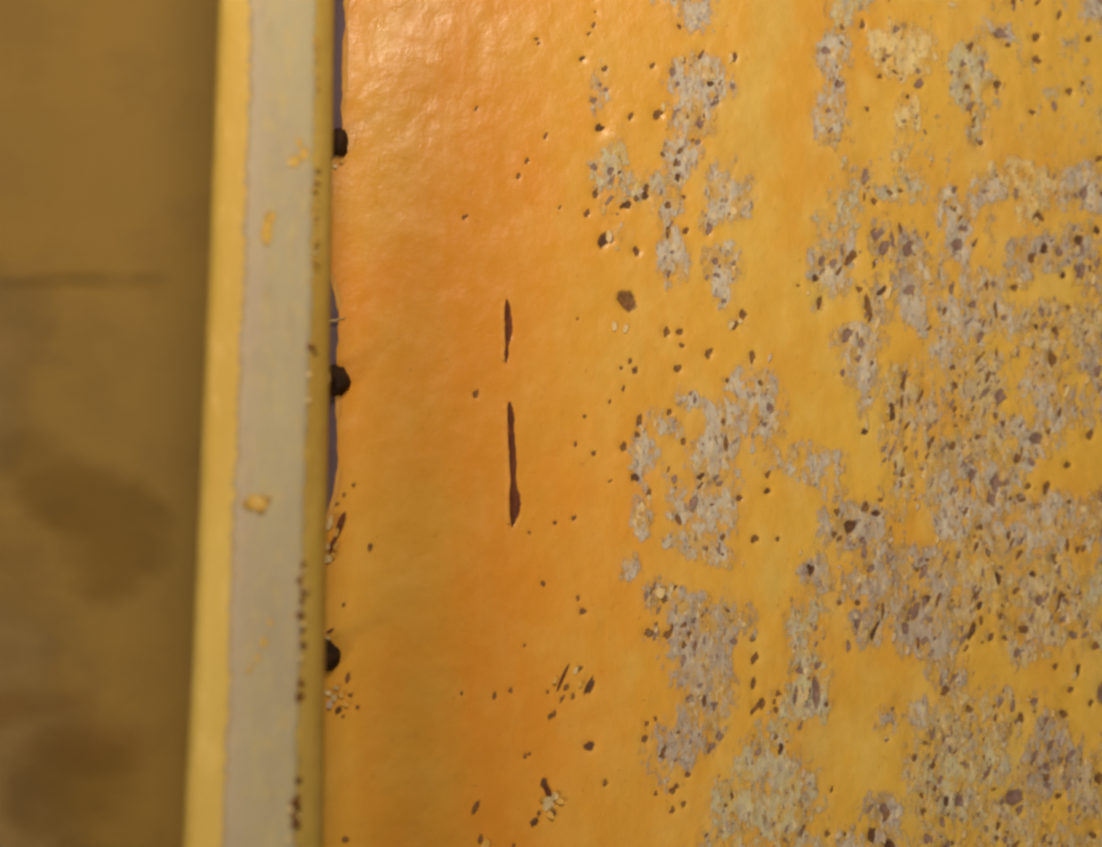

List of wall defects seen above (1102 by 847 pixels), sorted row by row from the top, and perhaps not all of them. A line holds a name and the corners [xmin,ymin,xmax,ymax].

flaking render [315,0,345,129]
peeling [584,50,755,309]
flaking render [307,284,339,365]
crack [499,299,512,363]
flaking render [326,396,355,563]
crack [502,402,521,527]
spalling [546,664,594,719]
spalling [530,778,564,826]